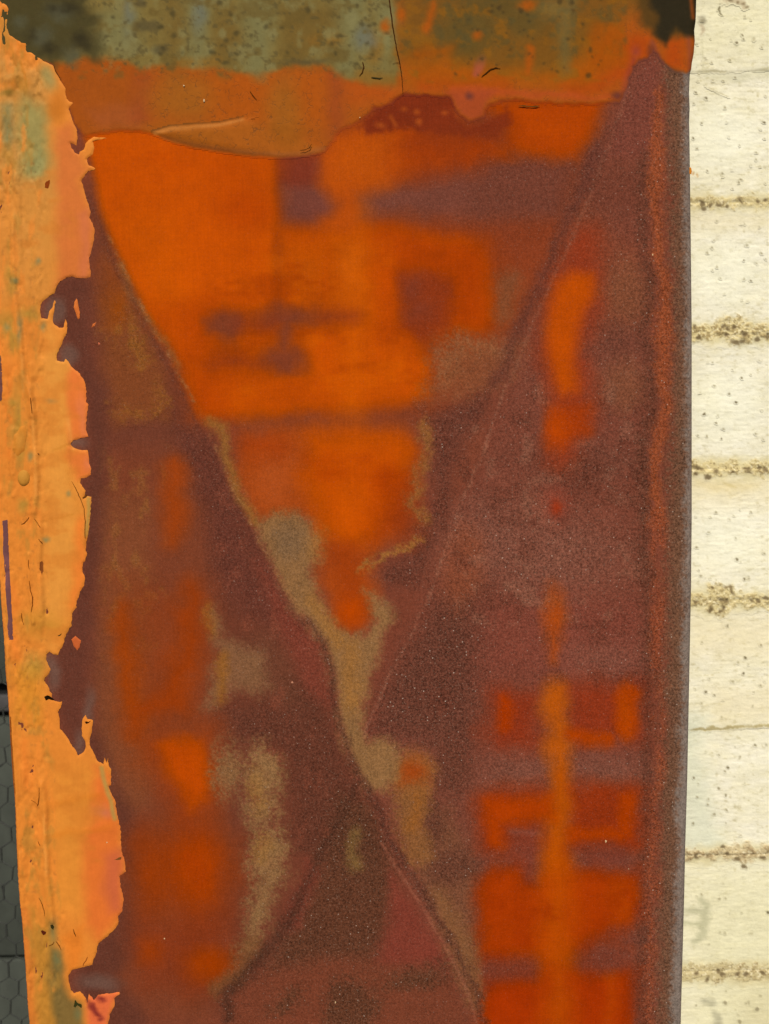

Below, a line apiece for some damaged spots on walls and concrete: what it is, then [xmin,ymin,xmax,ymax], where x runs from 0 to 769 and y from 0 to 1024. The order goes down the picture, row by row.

peeling [0,2,126,1024]
corrosion [91,444,247,1008]
corrosion [79,96,615,628]
peeling [57,24,695,159]
corrosion [462,82,681,1024]